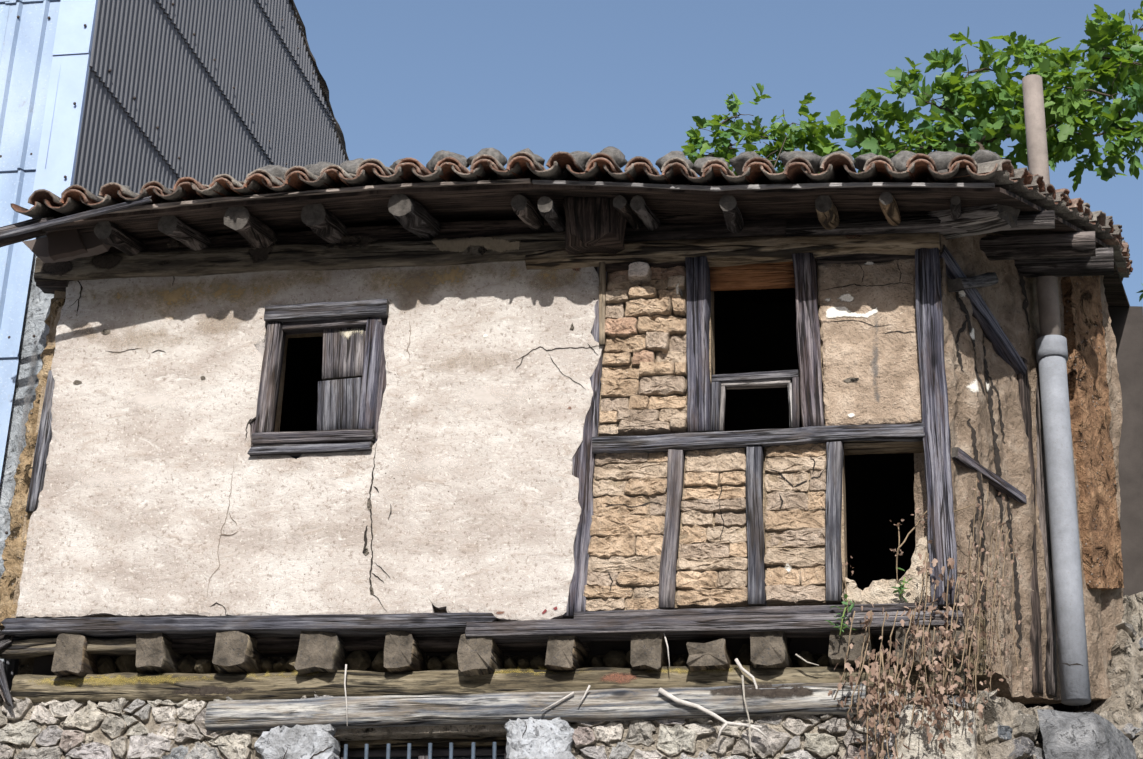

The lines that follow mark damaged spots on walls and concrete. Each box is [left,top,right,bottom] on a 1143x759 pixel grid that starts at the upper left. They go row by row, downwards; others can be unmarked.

crack [516,343,599,388]
crack [207,467,238,615]
crack [364,443,391,607]